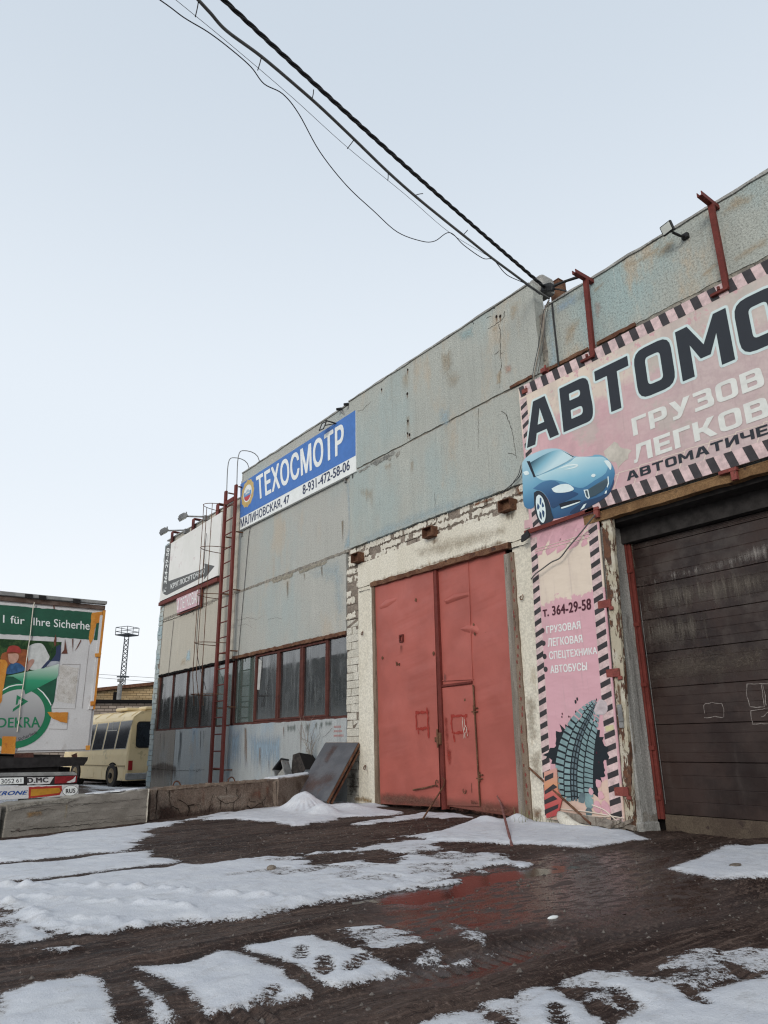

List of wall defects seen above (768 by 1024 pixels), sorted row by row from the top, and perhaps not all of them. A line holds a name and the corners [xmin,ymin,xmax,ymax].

peeling [346,484,524,620]